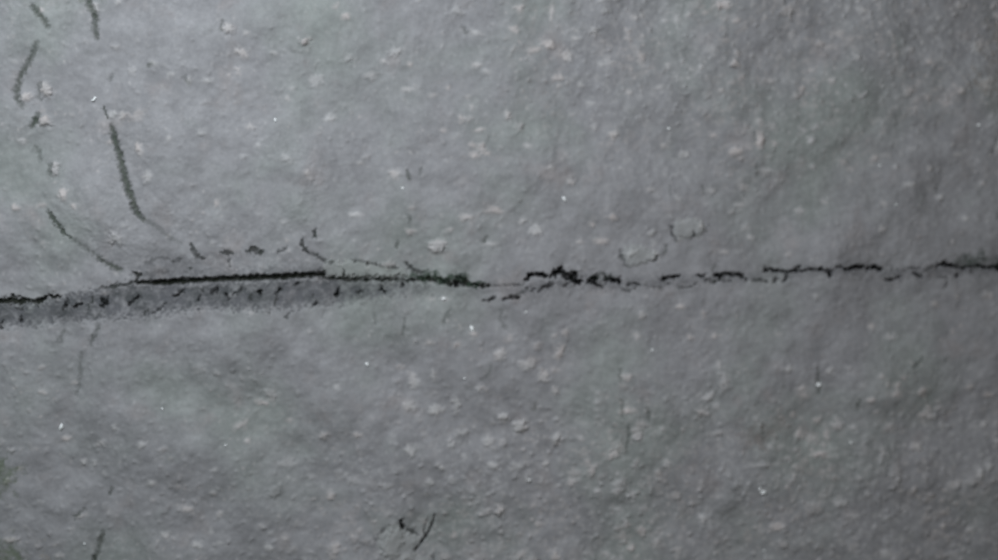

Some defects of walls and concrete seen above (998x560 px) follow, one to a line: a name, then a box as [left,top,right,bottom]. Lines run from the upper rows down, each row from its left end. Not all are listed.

crack [103,107,144,221]
crack [48,212,68,236]
crack [0,294,61,307]
crack [102,252,998,302]